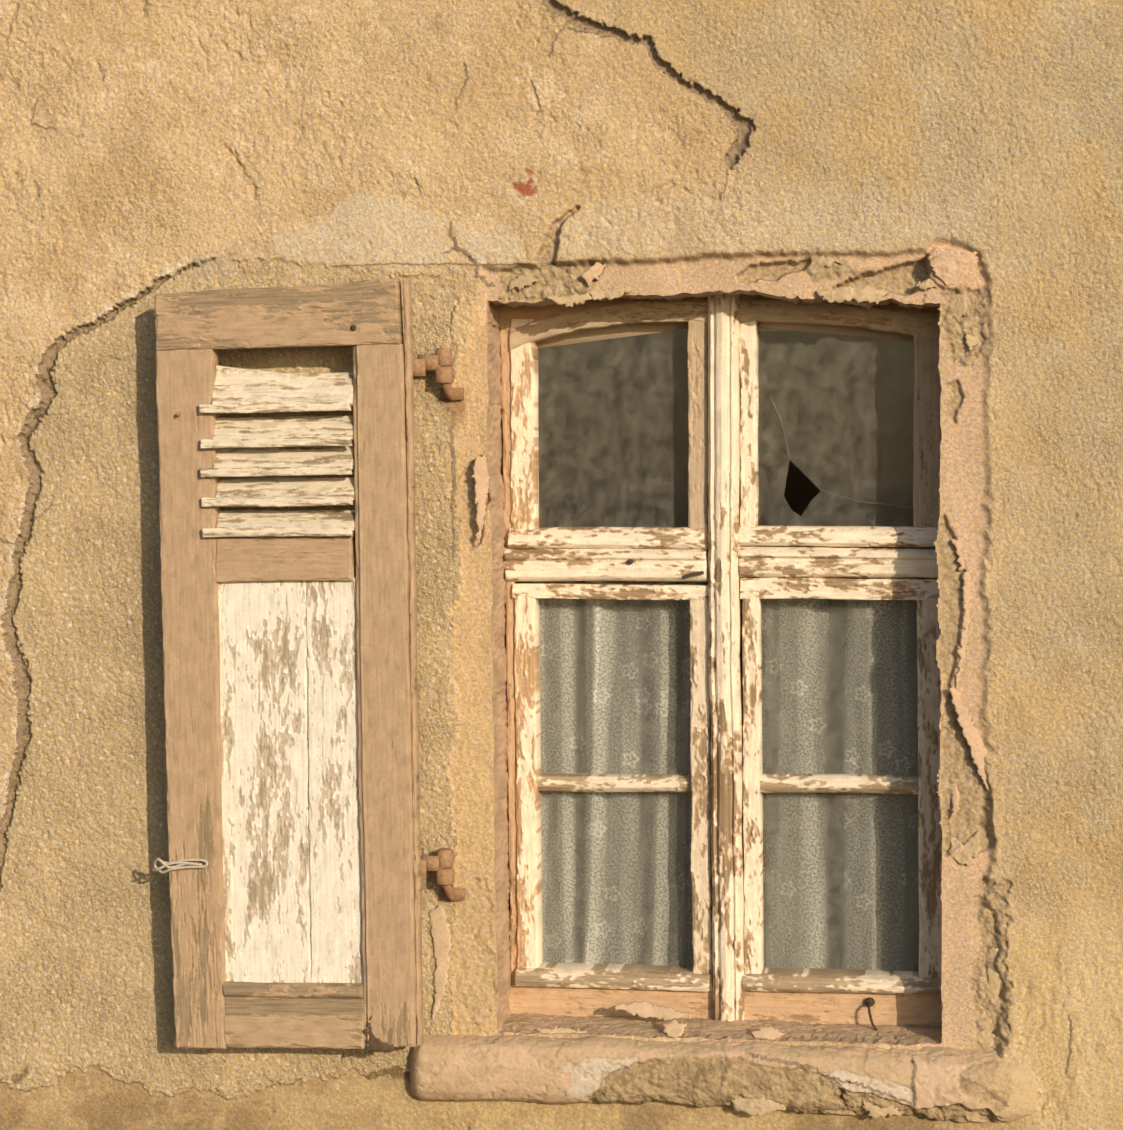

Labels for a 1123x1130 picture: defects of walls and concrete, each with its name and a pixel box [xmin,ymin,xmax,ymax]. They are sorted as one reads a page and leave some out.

crack [456,63,469,112]
crack [542,0,756,200]
flaking render [498,206,632,307]
crack [0,257,215,868]
flaking render [0,251,1050,1130]